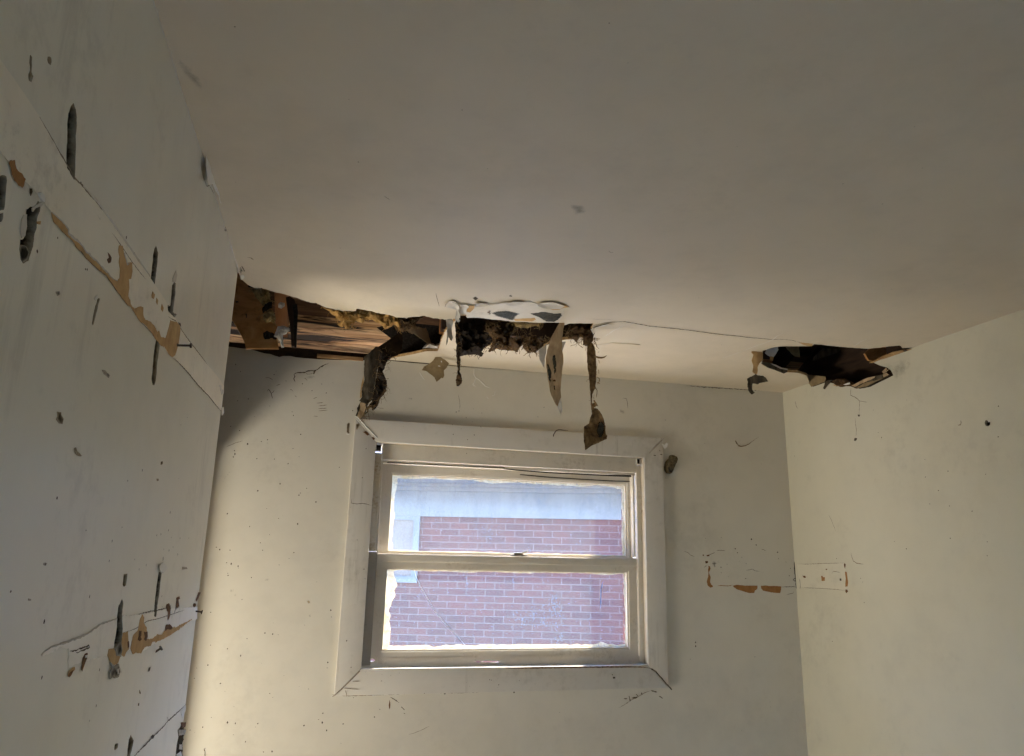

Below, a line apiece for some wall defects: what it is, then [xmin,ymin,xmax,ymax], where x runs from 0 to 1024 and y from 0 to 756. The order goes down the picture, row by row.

peeling [0,160,181,385]
peeling [445,301,469,345]
spalling [761,362,788,374]
spalling [832,368,889,389]
peeling [703,555,794,593]
peeling [107,563,192,679]